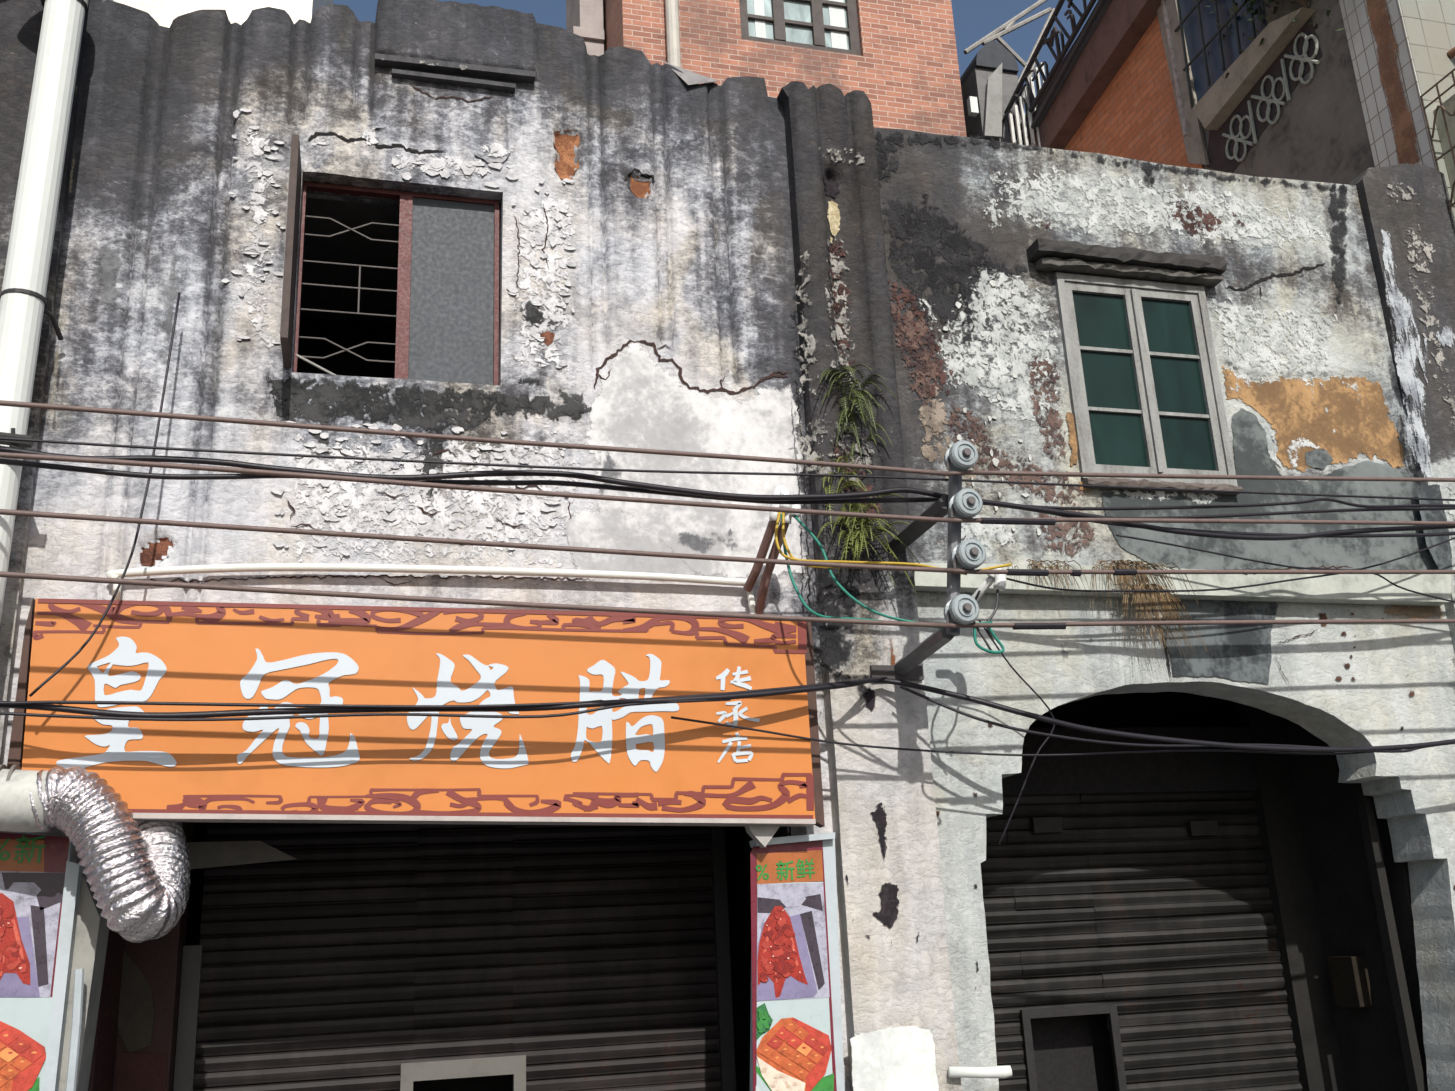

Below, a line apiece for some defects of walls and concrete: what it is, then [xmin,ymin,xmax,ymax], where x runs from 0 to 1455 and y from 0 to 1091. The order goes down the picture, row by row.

crack [308,127,511,164]
spalling [140,537,173,566]
peeling [270,421,584,568]
water stain [266,375,592,501]
water stain [519,300,562,328]
peeling [507,129,580,368]
crack [594,340,815,617]
peeling [888,269,1095,558]
water stain [874,131,1348,348]
crack [1226,263,1325,298]
spalling [1213,296,1404,472]
water stain [1381,229,1455,570]